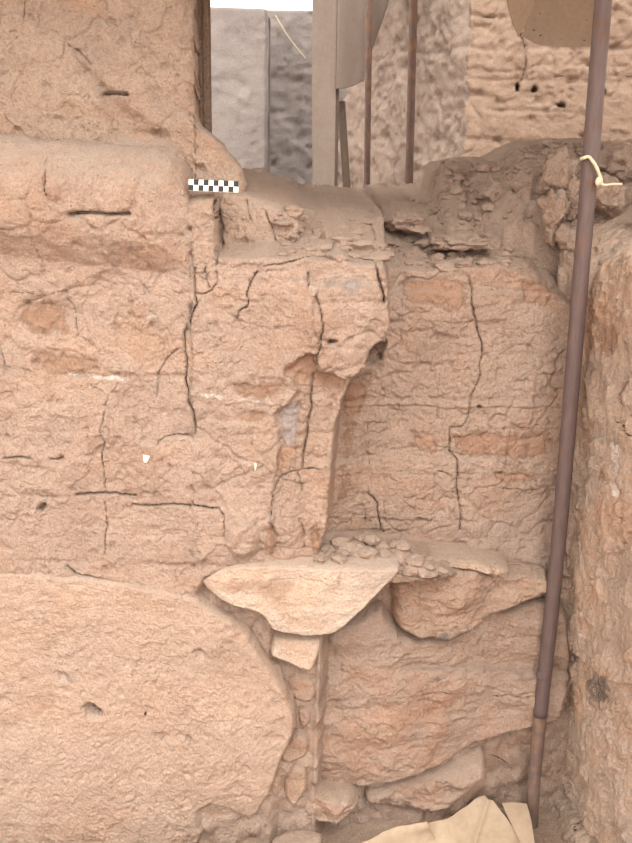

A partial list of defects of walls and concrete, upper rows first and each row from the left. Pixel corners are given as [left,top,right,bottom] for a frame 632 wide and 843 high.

crack [184,196,224,349]
crack [271,385,314,530]
crack [440,283,483,530]